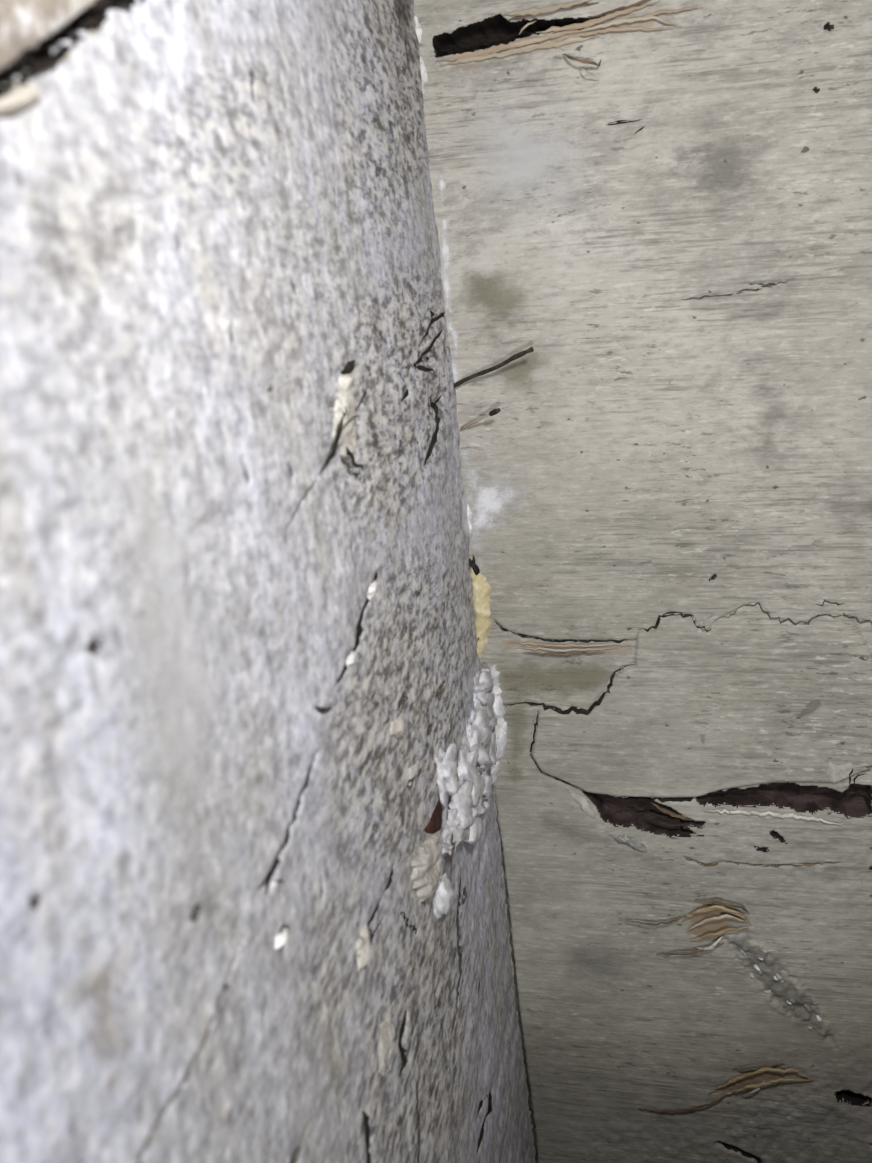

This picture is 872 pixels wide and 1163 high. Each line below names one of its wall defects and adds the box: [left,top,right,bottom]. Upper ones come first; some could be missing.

peeling [552,20,649,41]
crack [493,599,872,790]
water stain [435,664,601,857]
crack [622,795,694,803]
spalling [566,762,872,852]
water stain [433,873,454,920]
peeling [619,900,752,956]
peeling [639,1063,813,1112]